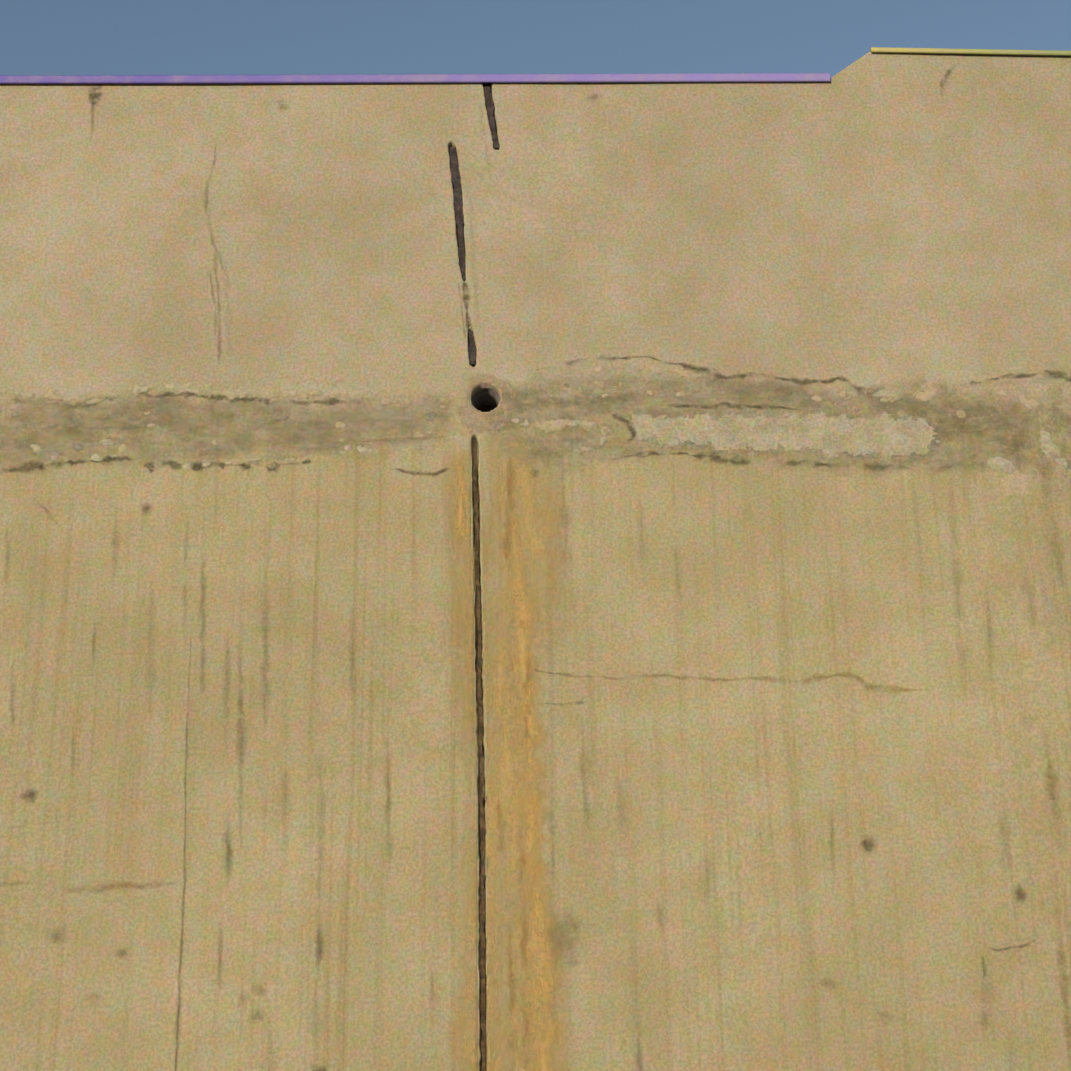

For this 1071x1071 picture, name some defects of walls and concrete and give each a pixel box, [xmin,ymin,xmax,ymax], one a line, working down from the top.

crack [482,83,500,148]
crack [450,147,477,364]
spalling [0,373,412,435]
spalling [549,356,747,407]
spalling [776,377,902,412]
spalling [8,439,129,471]
spalling [139,458,310,475]
spalling [510,418,611,453]
spalling [674,452,746,464]
spalling [1039,429,1071,471]
crack [473,439,486,1071]
rust [456,455,556,1071]